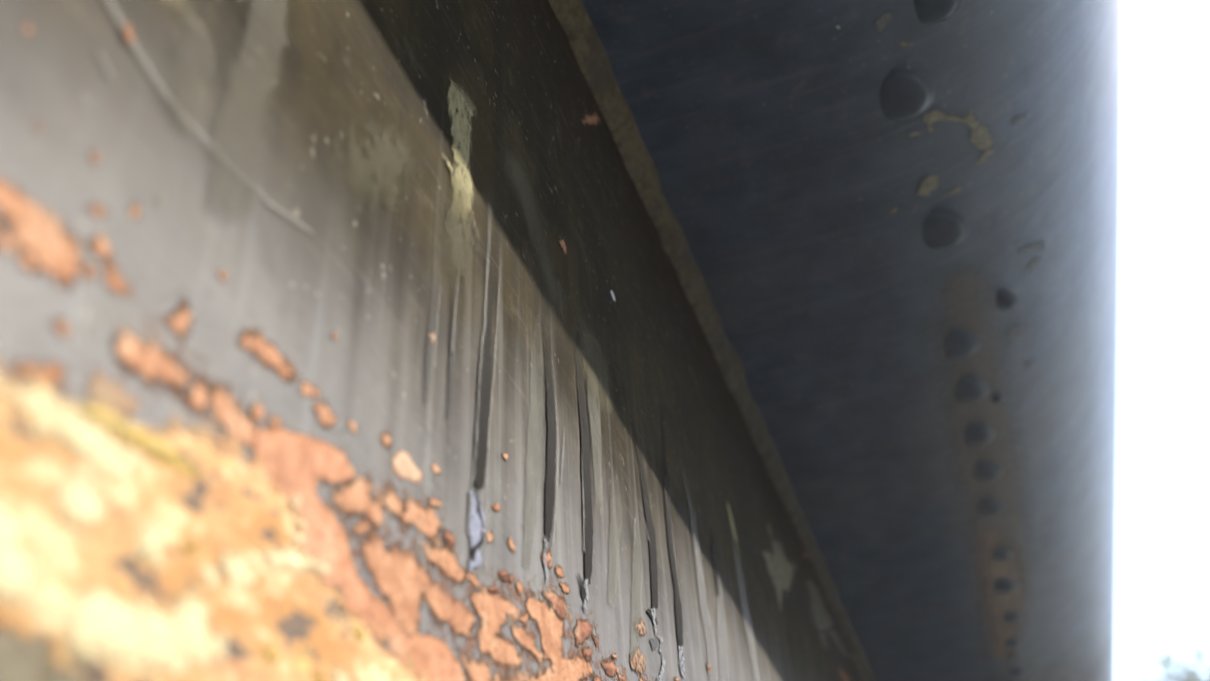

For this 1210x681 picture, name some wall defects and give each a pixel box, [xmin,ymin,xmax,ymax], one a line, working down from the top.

rust [0,179,136,299]
peeling [0,366,427,681]
peeling [236,325,358,433]
peeling [380,428,442,483]
damp [468,303,493,574]
damp [543,353,556,584]
damp [577,365,593,614]
damp [637,436,685,681]